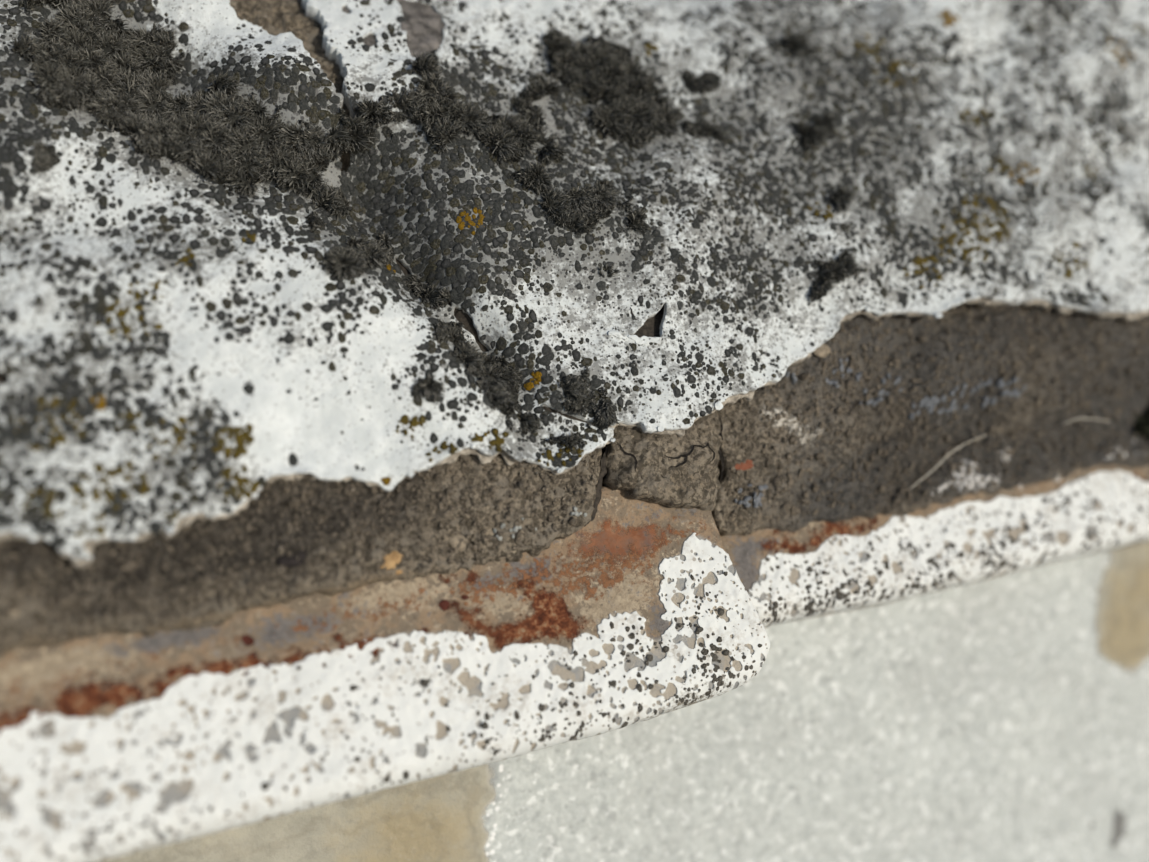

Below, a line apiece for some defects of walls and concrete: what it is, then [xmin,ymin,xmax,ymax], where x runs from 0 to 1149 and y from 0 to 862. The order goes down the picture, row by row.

spalling [230,0,324,50]
crack [395,258,410,276]
crack [448,302,489,352]
crack [542,406,587,423]
crack [619,442,638,472]
crack [665,417,725,481]
spalling [711,300,1149,537]
spalling [0,438,616,660]
corrosion [0,516,710,732]
water stain [1096,542,1149,671]
water stain [99,764,496,862]